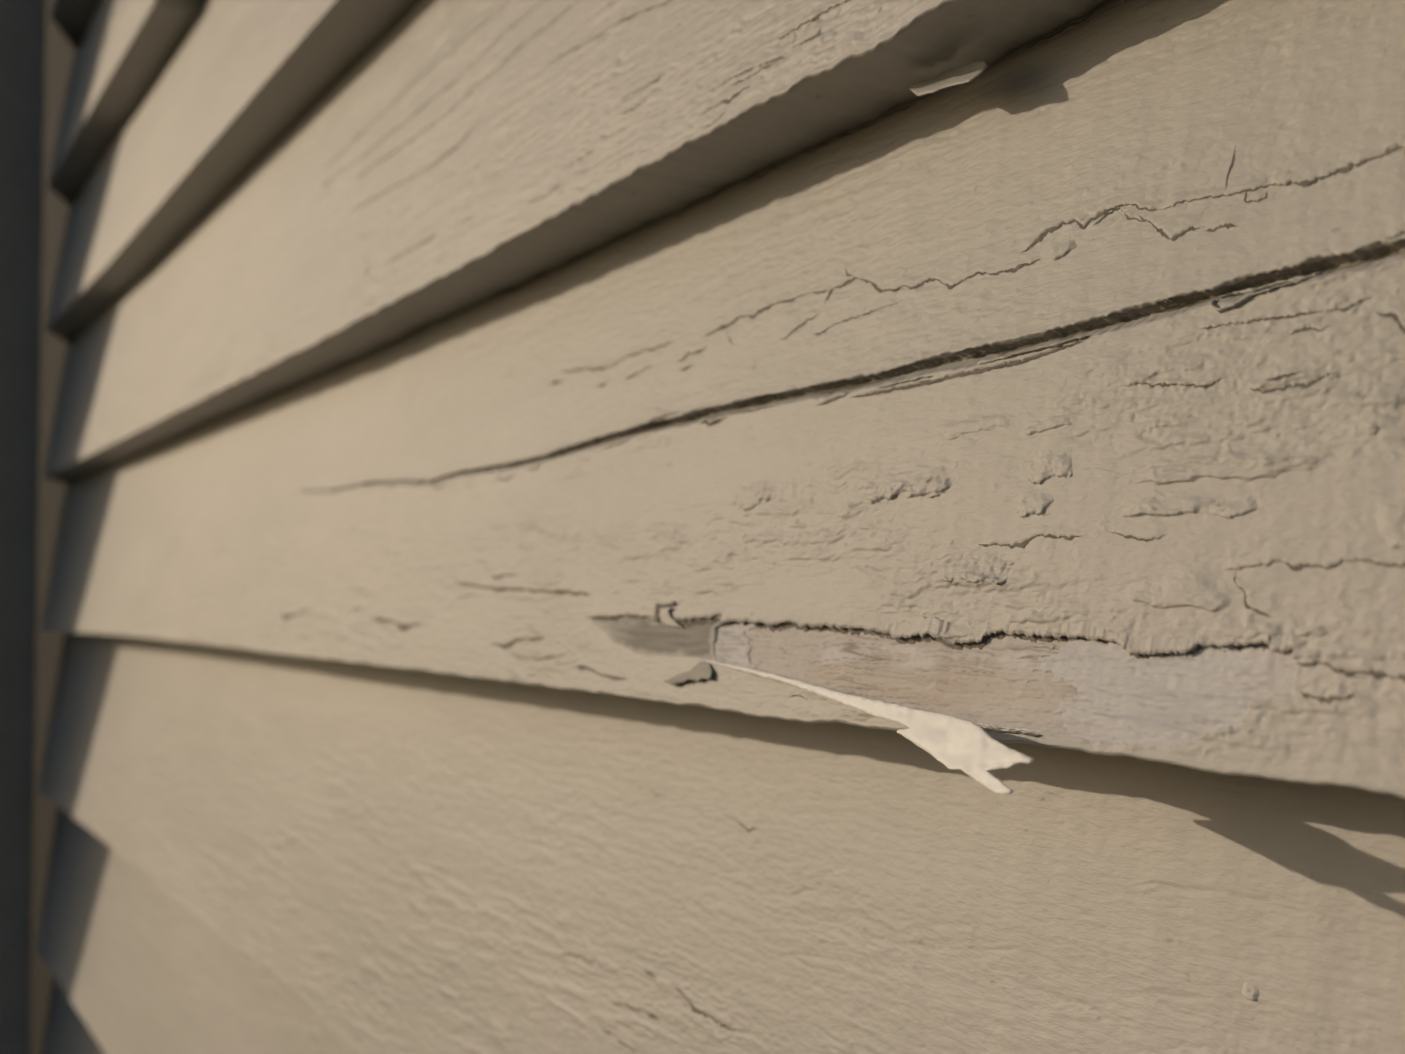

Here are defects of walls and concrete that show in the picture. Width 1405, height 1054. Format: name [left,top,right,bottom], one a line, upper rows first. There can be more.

crack [305,232,1405,494]
crack [546,145,1405,387]
peeling [593,601,1296,794]